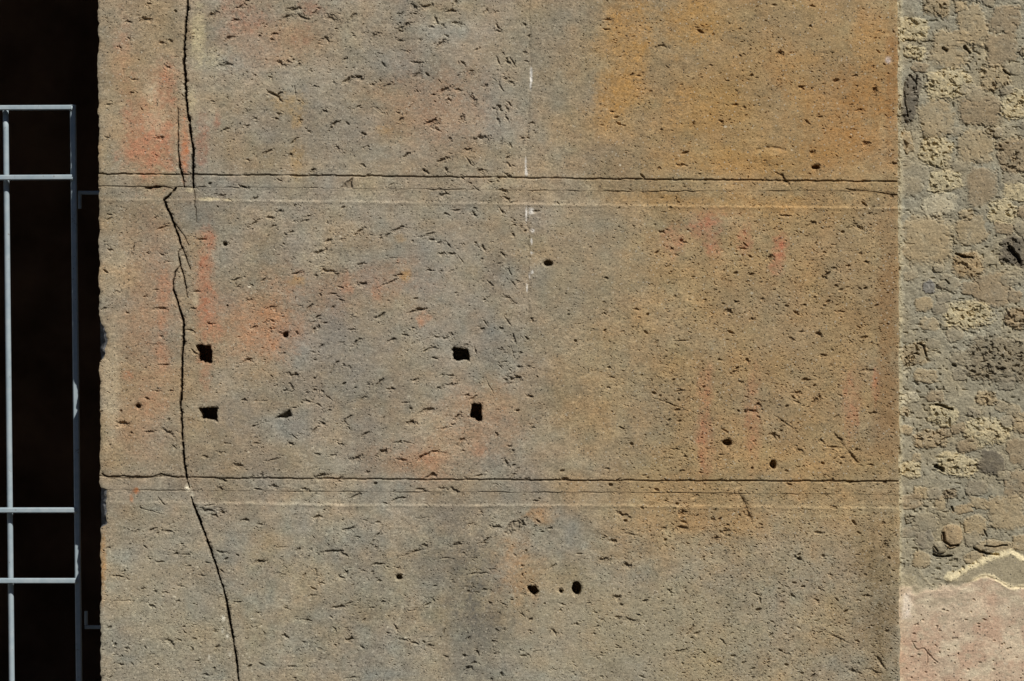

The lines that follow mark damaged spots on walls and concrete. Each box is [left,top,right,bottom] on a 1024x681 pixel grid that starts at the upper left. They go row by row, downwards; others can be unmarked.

crack [101,0,240,681]